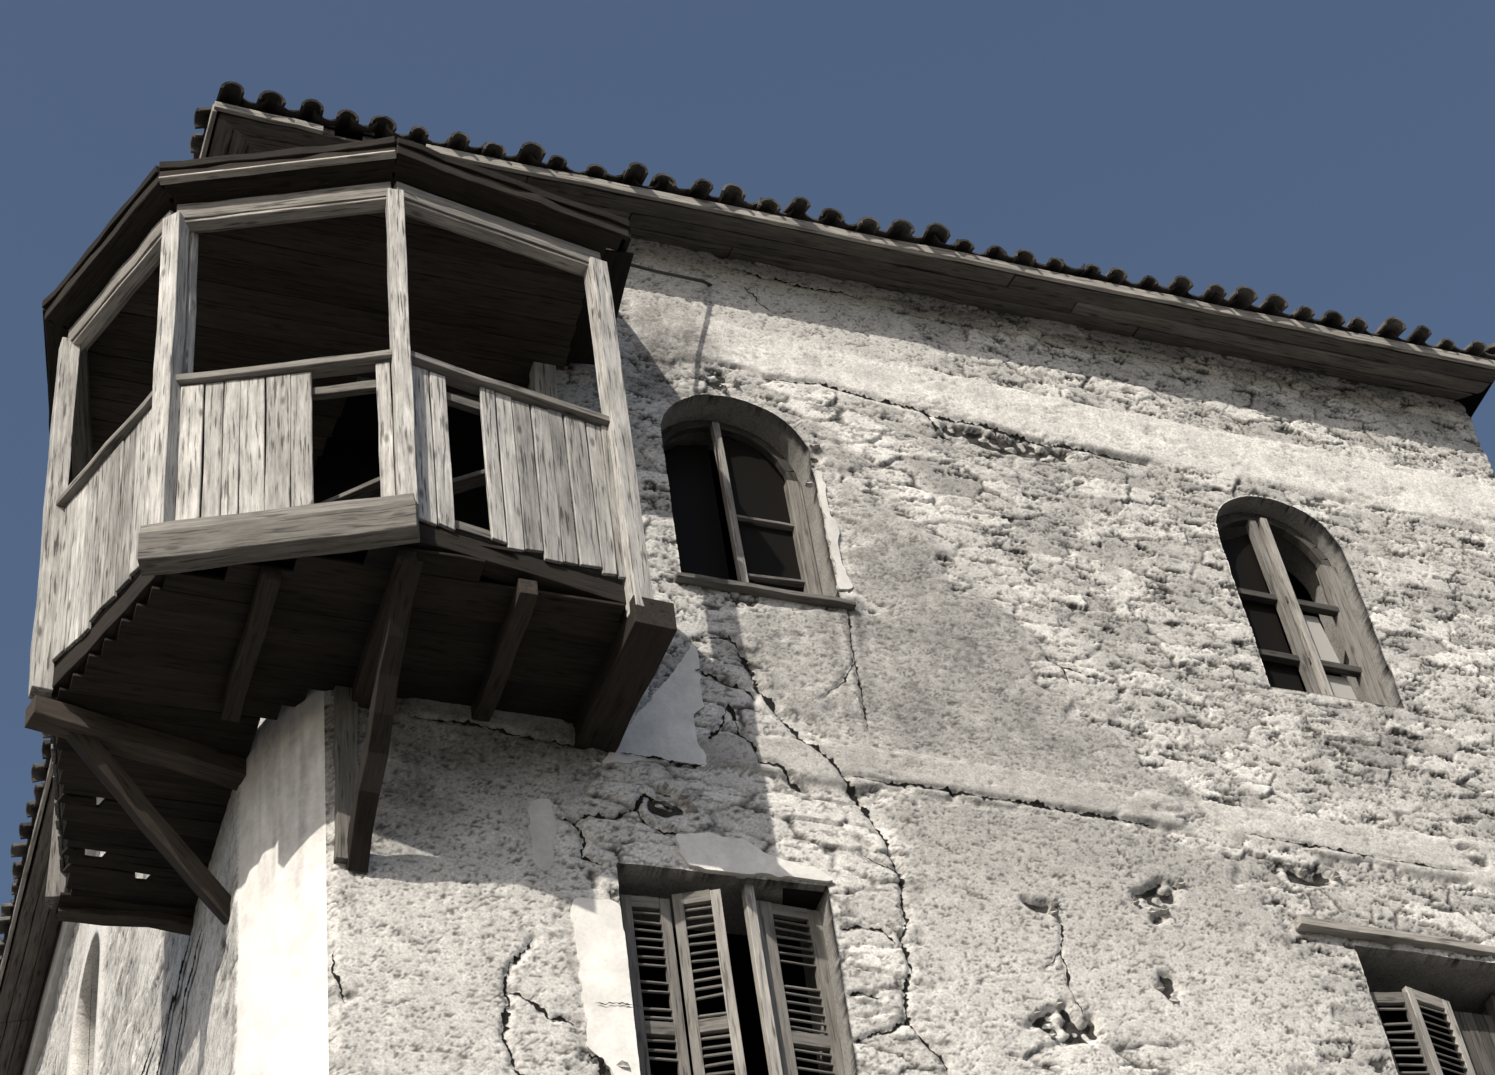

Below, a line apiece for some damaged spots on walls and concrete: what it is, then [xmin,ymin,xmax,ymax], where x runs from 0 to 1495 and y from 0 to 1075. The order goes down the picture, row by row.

crack [823,610,868,728]
crack [414,716,576,748]
crack [556,635,1149,1071]
crack [501,940,642,1075]
spalling [1032,999,1097,1044]